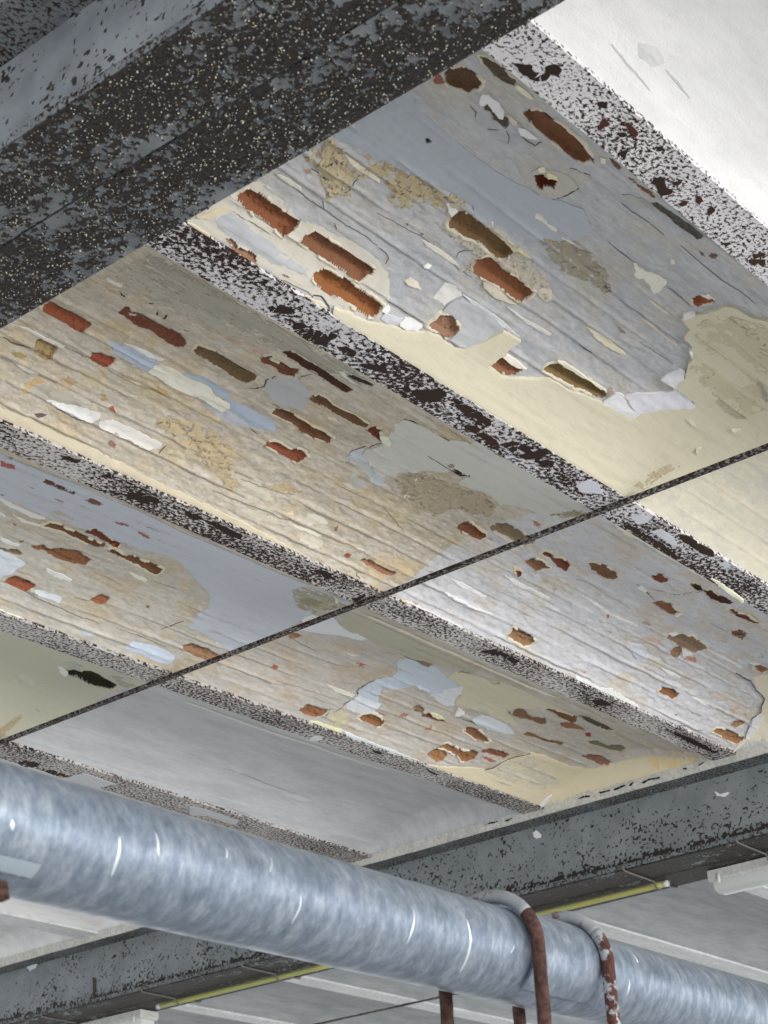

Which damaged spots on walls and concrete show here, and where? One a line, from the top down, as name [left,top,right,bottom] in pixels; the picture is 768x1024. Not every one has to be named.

peeling [0,0,611,348]
spalling [652,202,704,239]
peeling [89,339,158,371]
peeling [540,361,695,419]
peeling [46,400,162,450]
peeling [119,307,604,577]
peeling [630,514,679,547]
peeling [0,453,639,765]
flaking render [688,578,758,642]
flaking render [664,632,709,657]
flaking render [657,687,679,700]
flaking render [711,715,765,745]